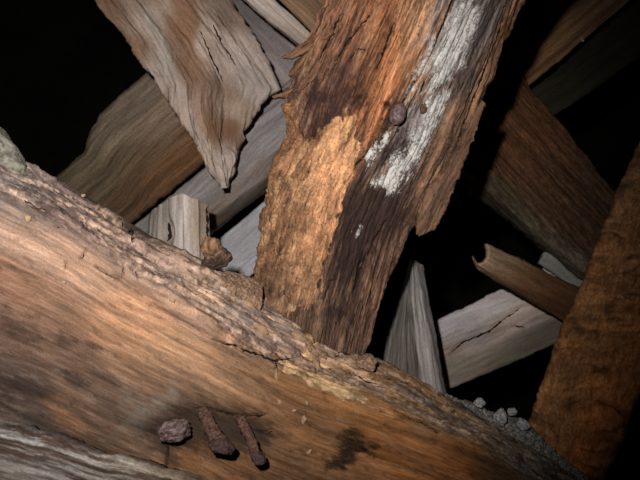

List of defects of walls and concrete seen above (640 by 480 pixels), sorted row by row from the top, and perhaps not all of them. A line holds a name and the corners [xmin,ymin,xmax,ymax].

crack [200,25,235,82]
leakage [328,0,481,324]
crack [451,307,525,353]
corrosion [145,408,207,462]
leakage [327,427,378,470]